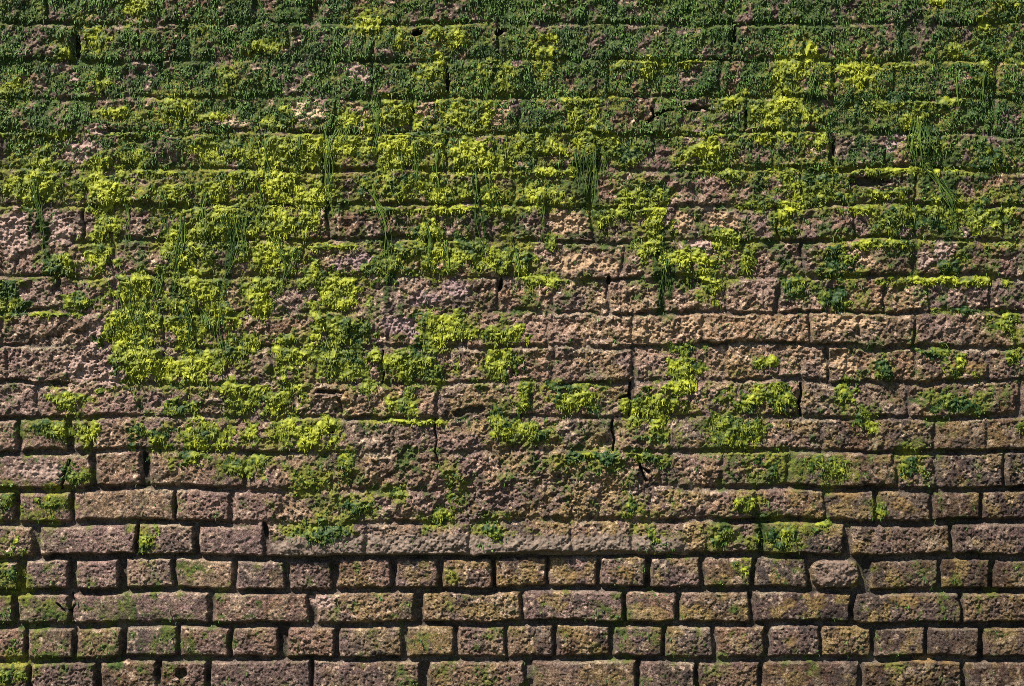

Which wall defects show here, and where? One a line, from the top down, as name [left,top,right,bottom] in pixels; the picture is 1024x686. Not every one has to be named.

crack [432,418,440,463]
crack [610,382,631,449]